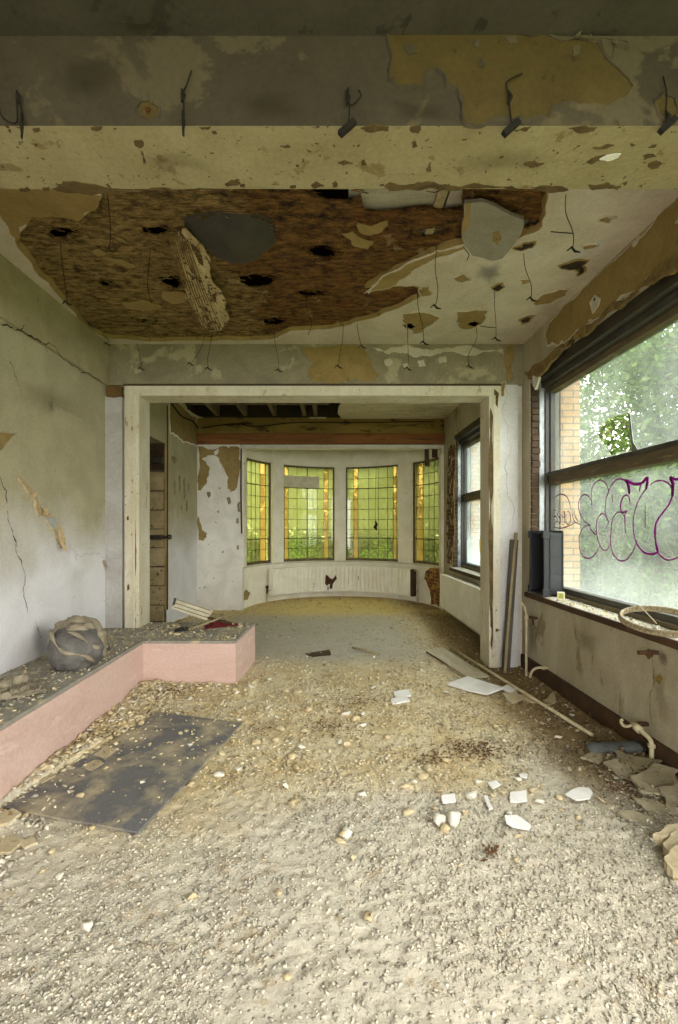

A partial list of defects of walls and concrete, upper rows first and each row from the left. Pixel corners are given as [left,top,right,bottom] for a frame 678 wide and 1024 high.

peeling [385,31,635,132]
spalling [360,123,389,133]
spalling [410,125,421,148]
spalling [569,125,597,134]
peeling [0,179,245,243]
crack [0,323,101,382]
peeling [0,431,17,452]
peeling [299,197,678,660]
peeling [169,403,240,542]